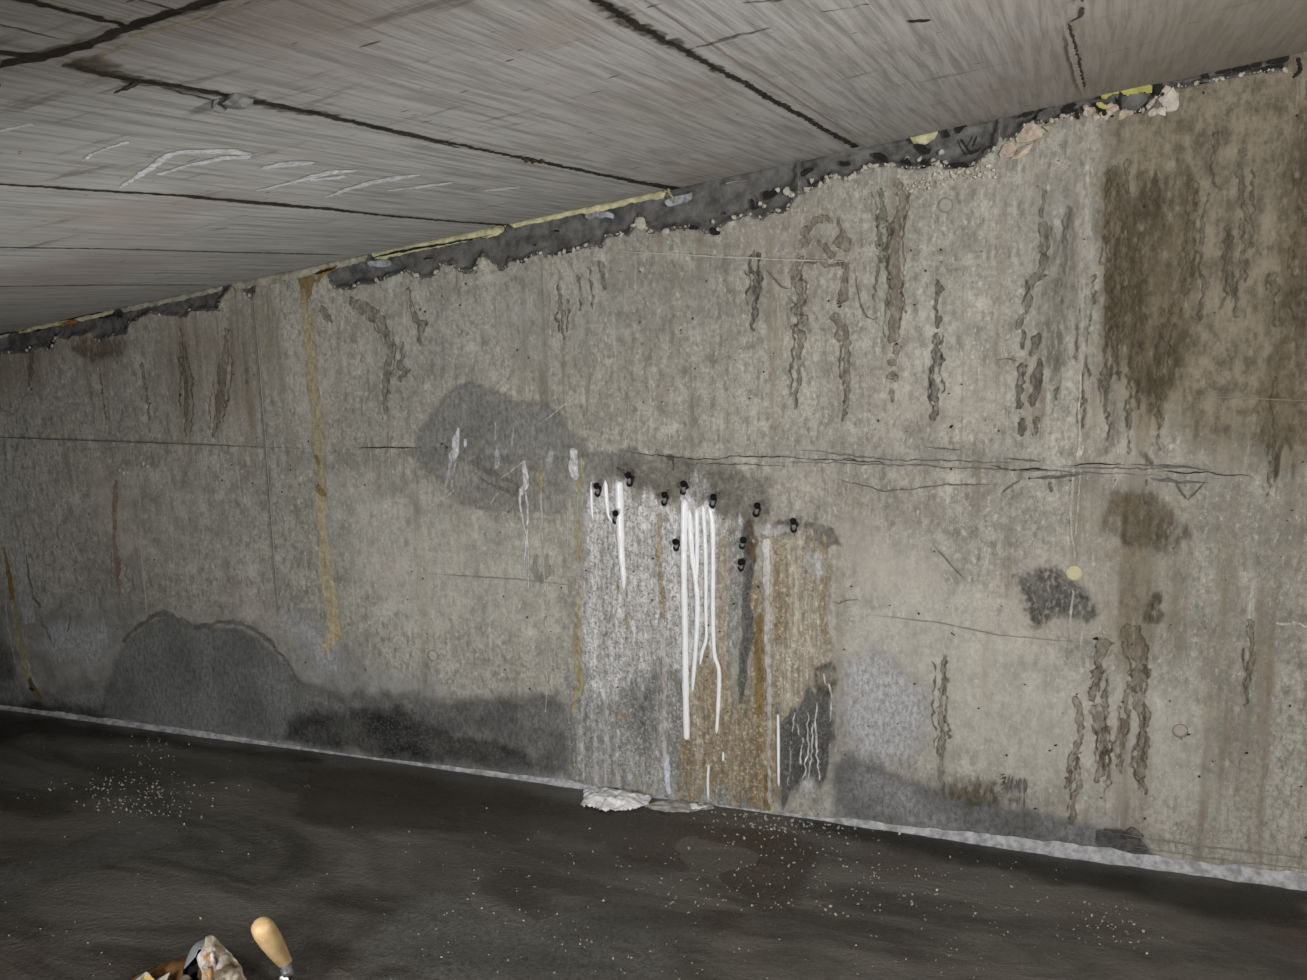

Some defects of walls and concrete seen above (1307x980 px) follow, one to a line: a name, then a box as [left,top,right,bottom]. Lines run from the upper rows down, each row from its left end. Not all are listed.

damp [119,149,454,197]
spalling [328,55,1303,290]
spalling [0,285,255,354]
damp [0,540,584,775]
crack [354,444,410,452]
corrosion [656,513,666,622]
corrosion [679,520,831,812]
damp [788,214,852,422]
damp [927,280,946,421]
crack [631,446,1252,492]
damp [616,454,1307,920]
damp [1015,132,1256,465]